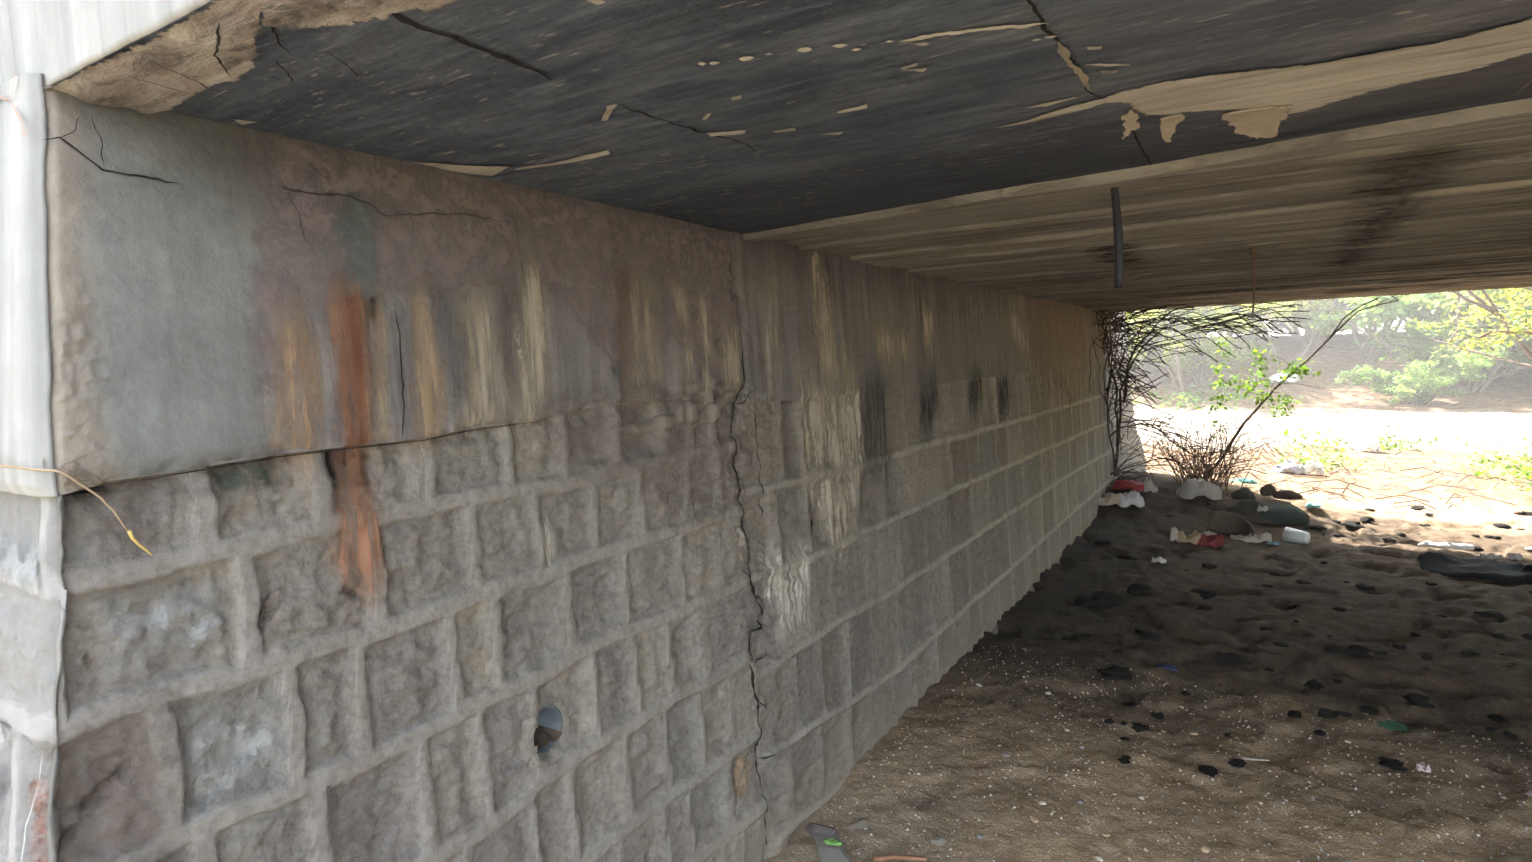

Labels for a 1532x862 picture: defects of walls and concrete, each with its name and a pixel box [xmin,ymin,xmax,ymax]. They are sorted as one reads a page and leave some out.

crack [45,116,180,184]
spalling [43,0,460,115]
crack [391,13,552,80]
peeling [411,150,609,176]
peeling [602,104,617,121]
peeling [702,113,746,136]
crack [1026,0,1102,99]
peeling [997,17,1532,143]
leakage [1334,147,1452,266]
corrosion [279,328,321,459]
corrosion [328,285,383,593]
crack [731,289,775,858]